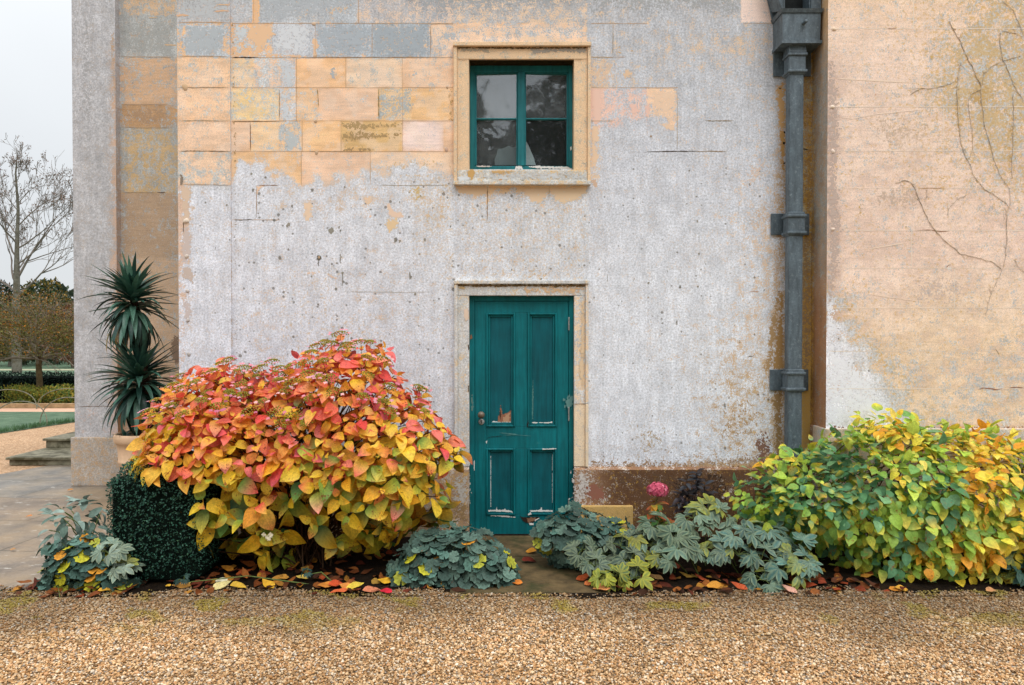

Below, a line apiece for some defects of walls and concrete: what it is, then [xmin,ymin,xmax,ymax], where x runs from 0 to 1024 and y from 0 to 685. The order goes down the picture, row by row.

peeling [232,0,319,59]
peeling [515,59,635,204]
leakage [591,431,772,516]